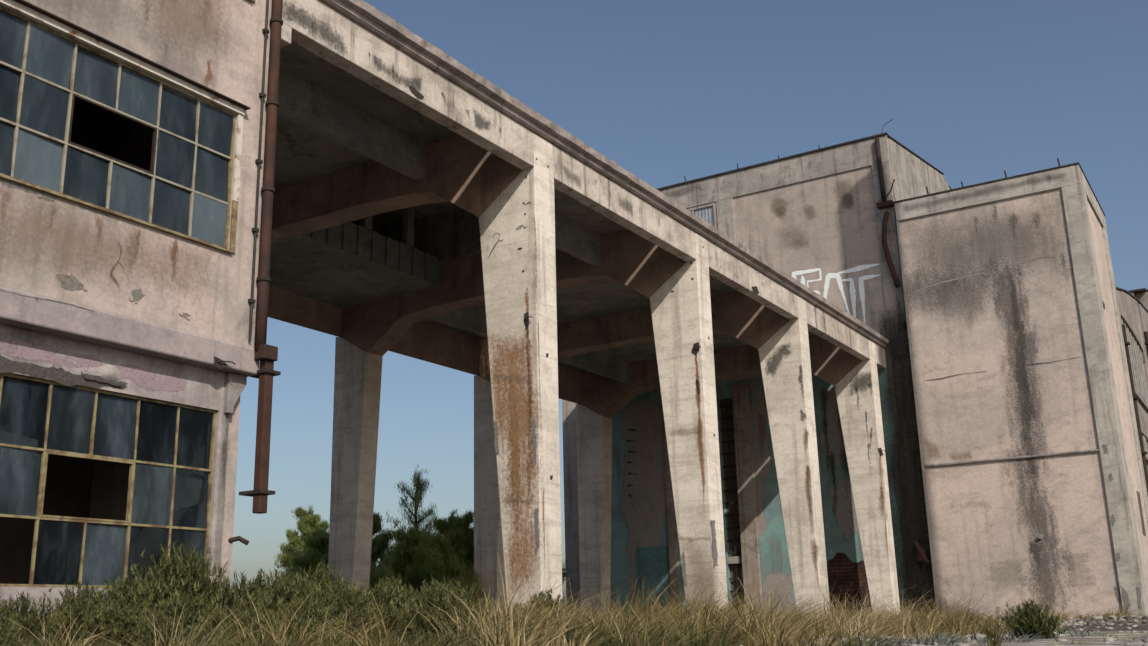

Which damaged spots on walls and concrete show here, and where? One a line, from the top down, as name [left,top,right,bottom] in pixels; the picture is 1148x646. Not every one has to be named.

spalling [56,273,88,291]
spalling [129,288,145,303]
corrosion [492,327,545,590]
peeling [618,397,667,615]
corrosion [695,354,705,491]
spalling [710,520,719,567]
peeling [748,379,772,536]
peeling [819,386,872,619]
leakage [851,373,872,399]
leakage [879,310,936,616]
leakage [926,218,1063,609]